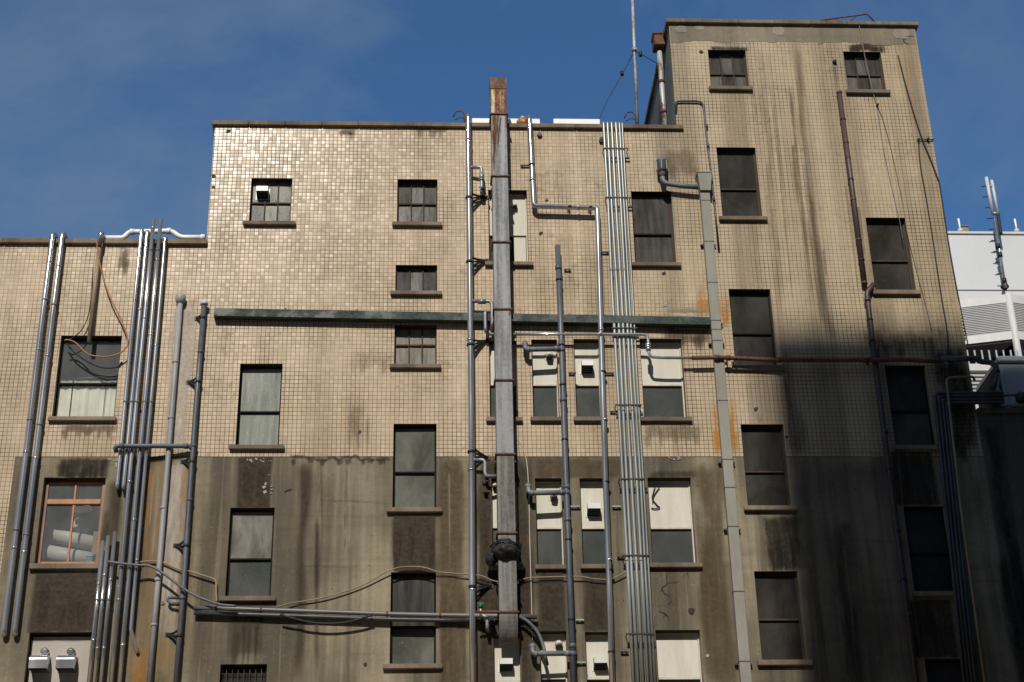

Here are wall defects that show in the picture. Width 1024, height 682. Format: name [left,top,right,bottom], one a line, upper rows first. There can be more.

water stain [234,606,260,657]
water stain [292,455,389,659]